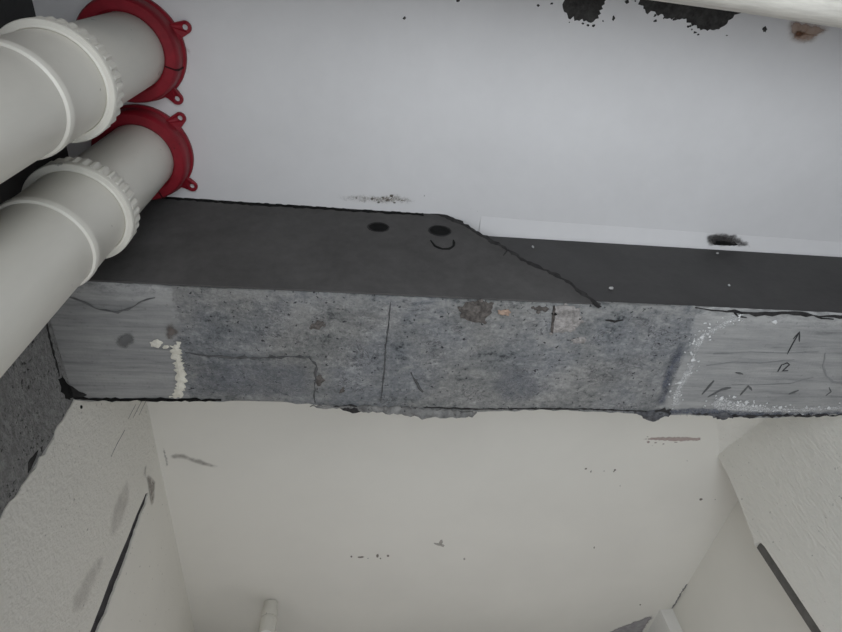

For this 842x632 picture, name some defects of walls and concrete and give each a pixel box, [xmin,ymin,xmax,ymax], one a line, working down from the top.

peeling [550,0,615,27]
peeling [625,0,740,36]
corrosion [791,22,824,40]
flaking render [708,234,747,254]
crack [69,297,155,314]
spalling [458,299,511,324]
crack [46,323,60,377]
crack [185,352,318,403]